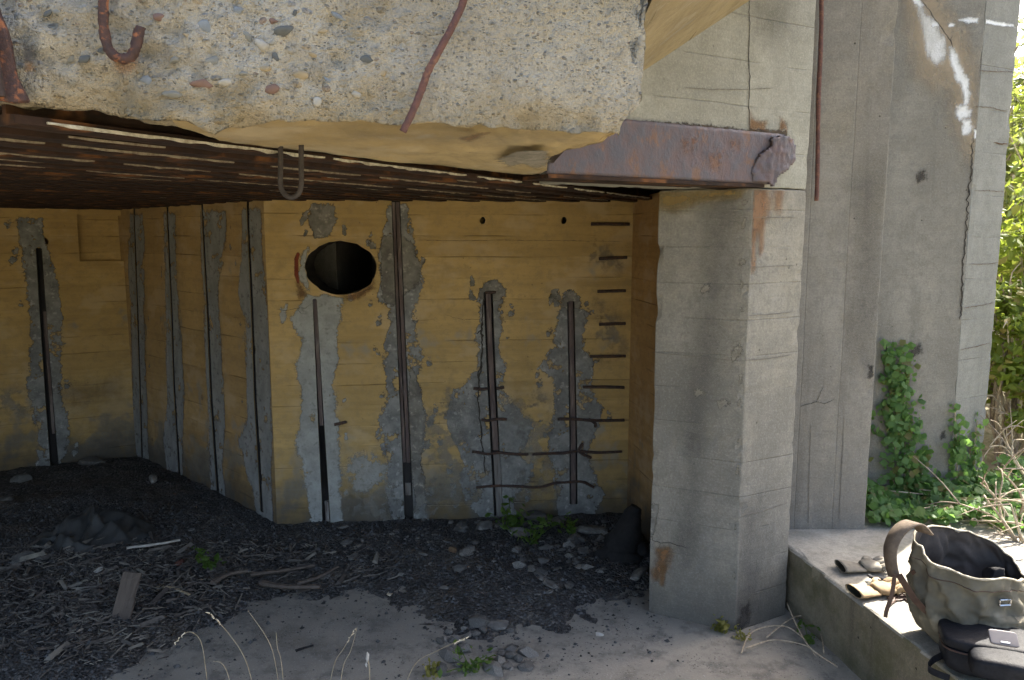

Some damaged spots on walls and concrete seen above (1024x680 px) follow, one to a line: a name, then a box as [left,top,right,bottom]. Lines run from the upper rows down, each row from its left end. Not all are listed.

corrosion [651,119,787,136]
water stain [910,0,1014,154]
corrosion [752,190,782,268]
crack [959,141,1006,319]
peeling [4,217,79,466]
peeling [200,203,626,523]
corrosion [653,547,670,586]